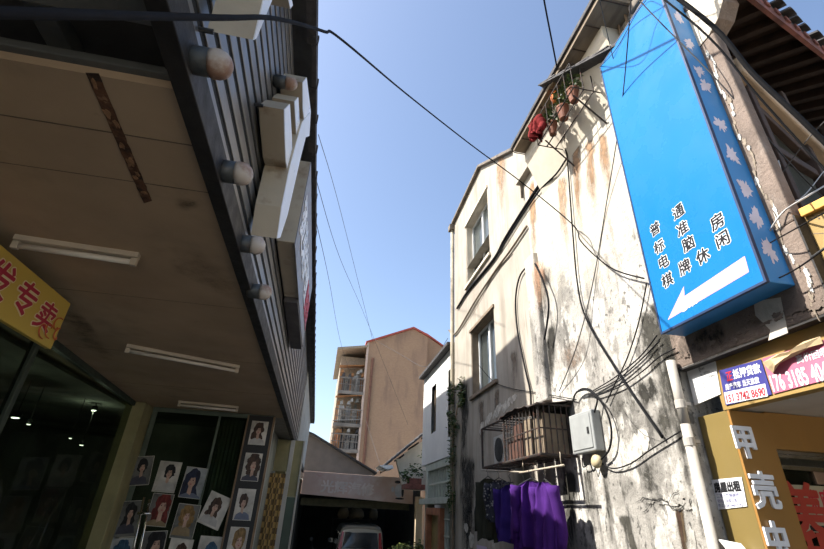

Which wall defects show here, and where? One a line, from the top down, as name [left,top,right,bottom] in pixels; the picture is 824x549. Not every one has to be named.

rust [86,73,152,203]
damp [539,326,555,381]
damp [563,471,592,541]
damp [620,516,637,549]